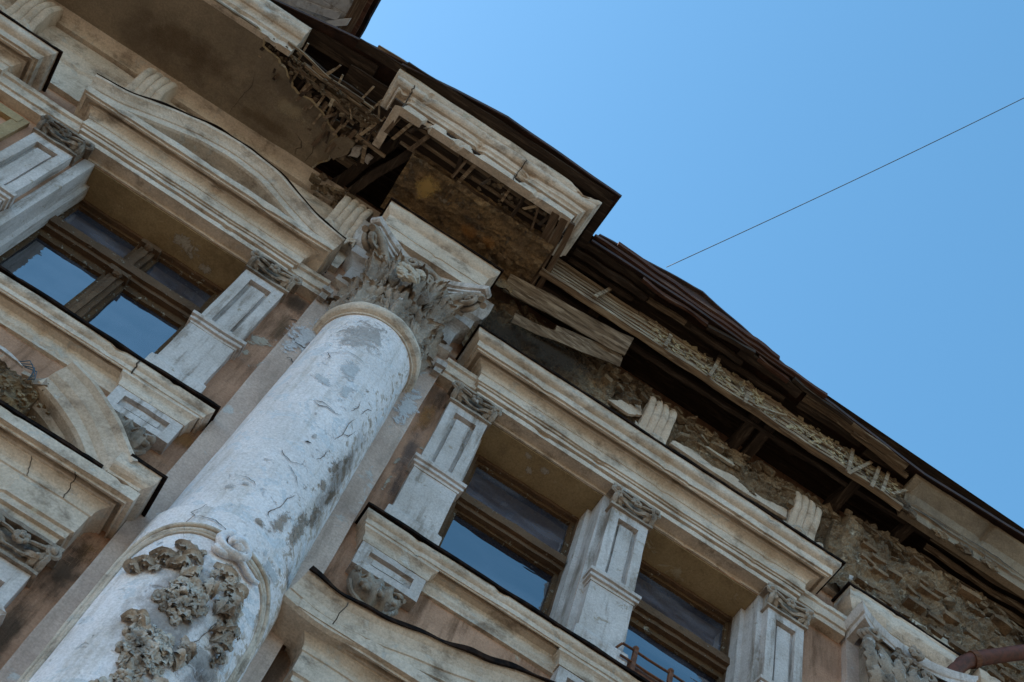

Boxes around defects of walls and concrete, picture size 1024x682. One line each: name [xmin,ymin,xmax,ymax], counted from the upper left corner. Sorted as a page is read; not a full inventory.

spalling [255,26,1024,655]
crack [268,400,372,516]
crack [183,504,226,535]
spalling [969,660,1024,682]